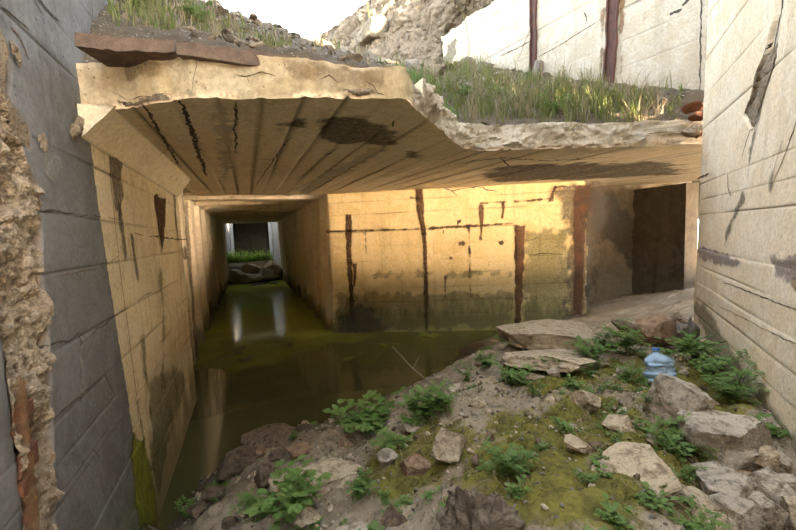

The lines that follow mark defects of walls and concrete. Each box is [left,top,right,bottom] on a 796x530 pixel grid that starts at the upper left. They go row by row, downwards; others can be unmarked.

crack [113,60,208,177]
crack [501,11,601,57]
crack [669,0,718,90]
spalling [744,43,778,127]
crack [763,0,784,55]
spalling [0,29,65,530]
rust [154,194,166,249]
rust [326,185,591,330]
leakage [698,247,739,266]
leakage [770,254,796,282]
rust [10,379,40,530]